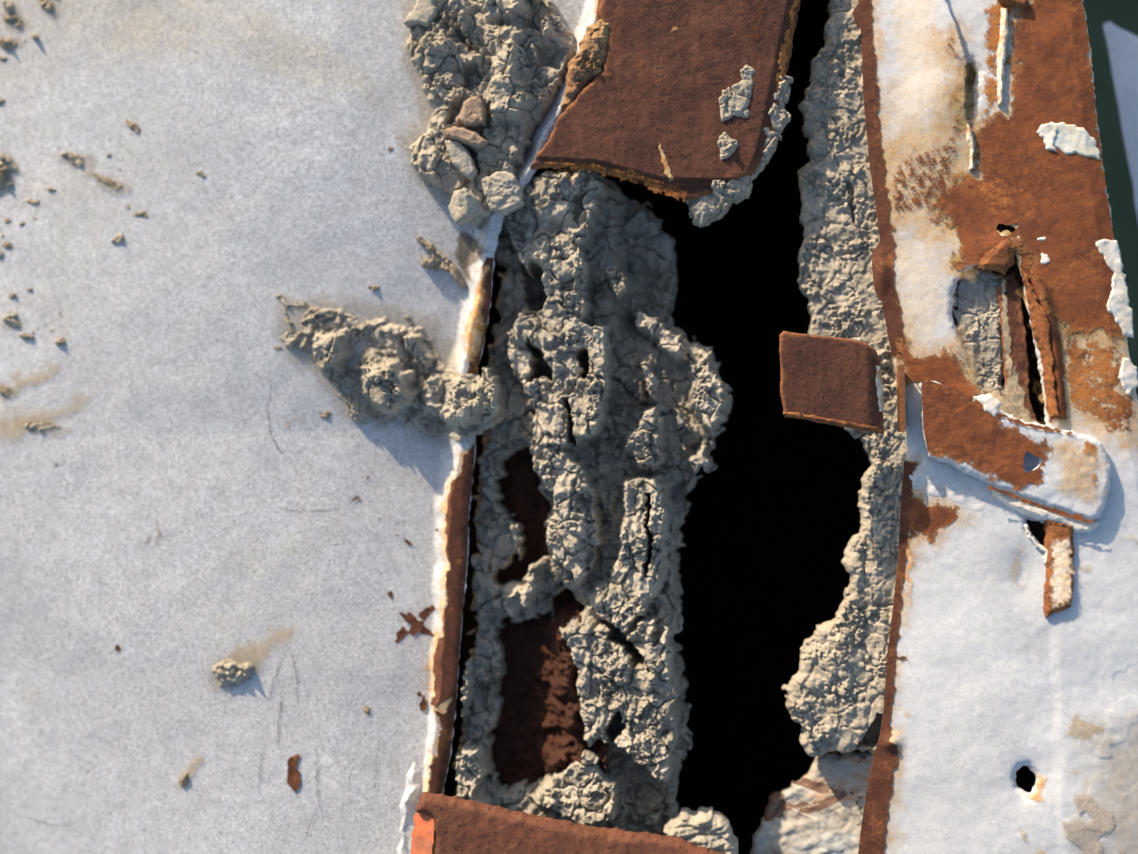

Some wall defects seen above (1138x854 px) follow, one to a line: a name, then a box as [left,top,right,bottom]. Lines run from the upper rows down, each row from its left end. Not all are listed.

rust [561,0,610,112]
rust [768,0,799,140]
rust [544,144,689,202]
peeling [1037,122,1101,160]
peeling [1096,239,1134,338]
rust [783,411,884,433]
rust [853,0,1138,854]
rust [424,443,475,794]